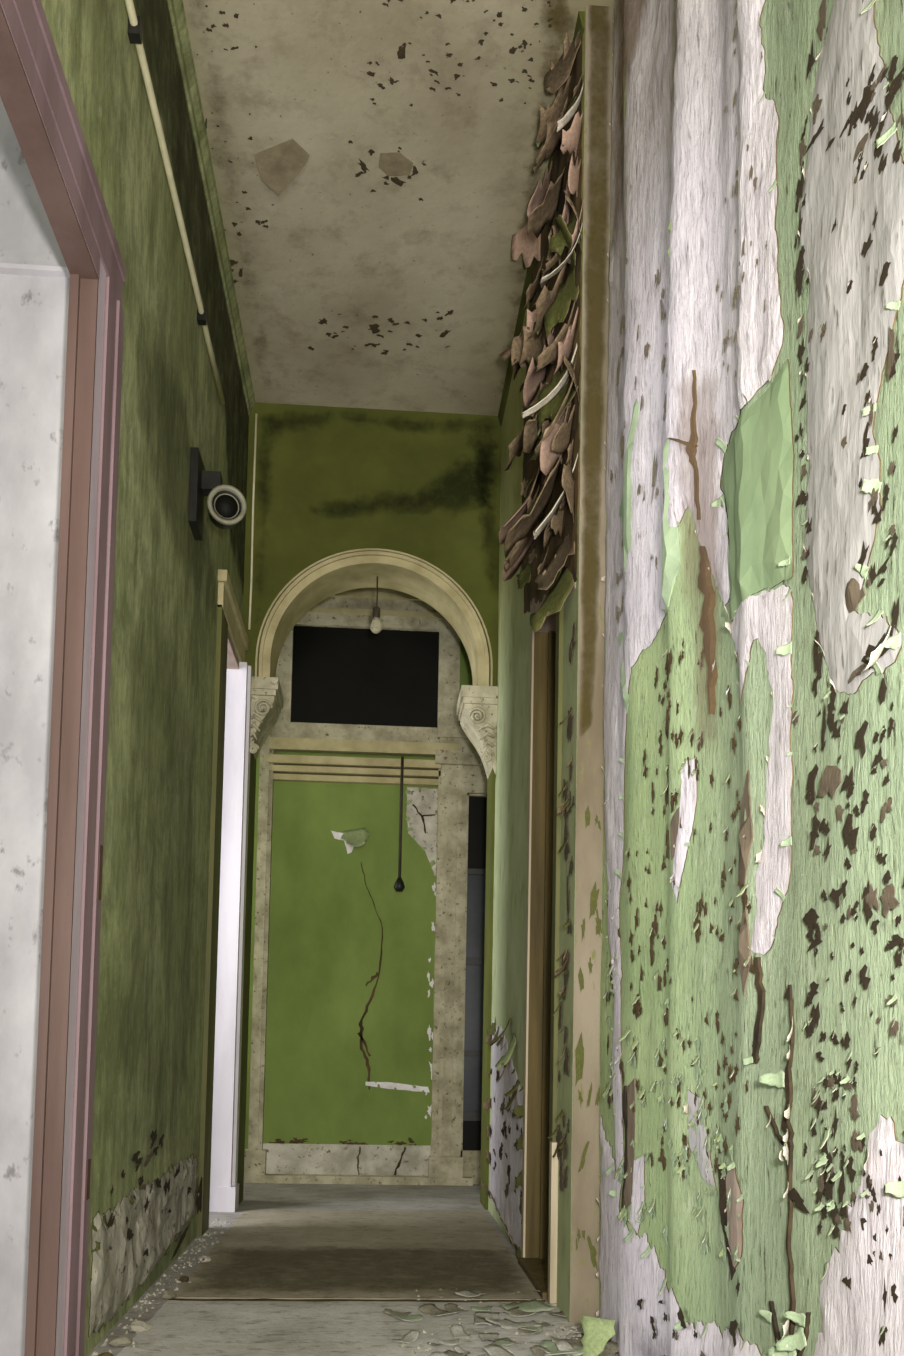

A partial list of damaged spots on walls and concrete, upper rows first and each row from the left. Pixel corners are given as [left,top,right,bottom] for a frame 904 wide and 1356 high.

peeling [248,136,310,205]
peeling [367,61,398,105]
peeling [397,0,585,633]
peeling [547,0,904,1356]
peeling [331,828,369,854]
peeling [405,787,438,896]
crack [357,862,383,1090]
spalling [88,1130,202,1337]